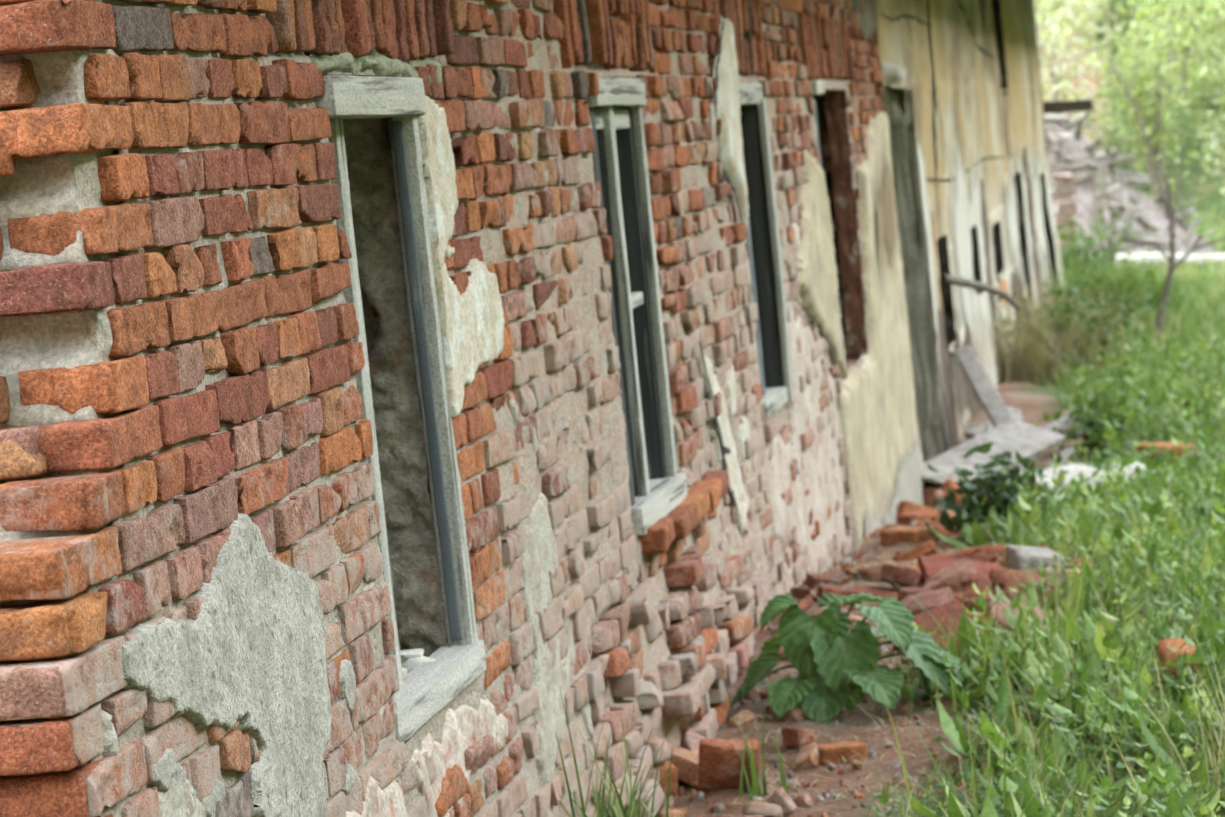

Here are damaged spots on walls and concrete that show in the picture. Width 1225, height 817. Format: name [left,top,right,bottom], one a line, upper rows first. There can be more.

peeling [712,15,749,243]
crack [880,0,1004,229]
peeling [417,96,504,418]
peeling [637,110,918,583]
peeling [120,513,358,817]
spalling [400,648,437,677]
spalling [435,639,524,817]